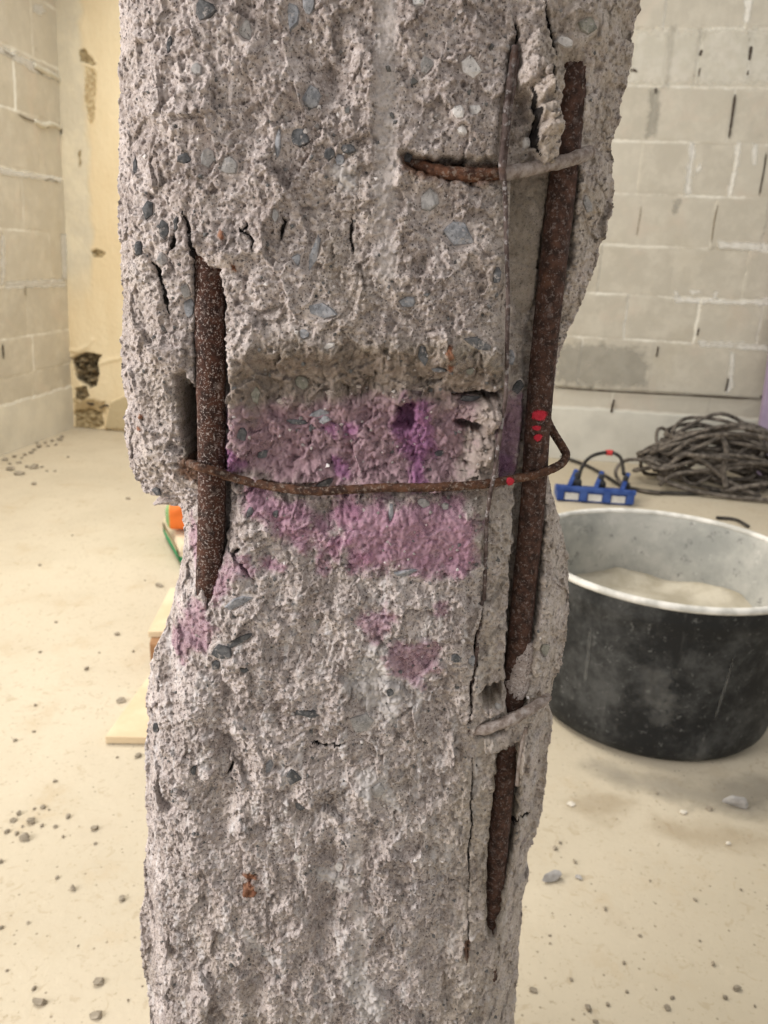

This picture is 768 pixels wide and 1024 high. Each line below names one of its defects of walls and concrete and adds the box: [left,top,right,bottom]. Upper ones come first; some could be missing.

spalling [559,61,586,155]
crack [151,211,195,315]
crack [239,223,254,249]
corrosion [179,449,198,481]
spalling [194,249,499,607]
spalling [504,165,579,713]
crack [469,611,483,721]
crack [466,763,474,962]
spalling [486,743,517,935]
crack [511,812,530,826]